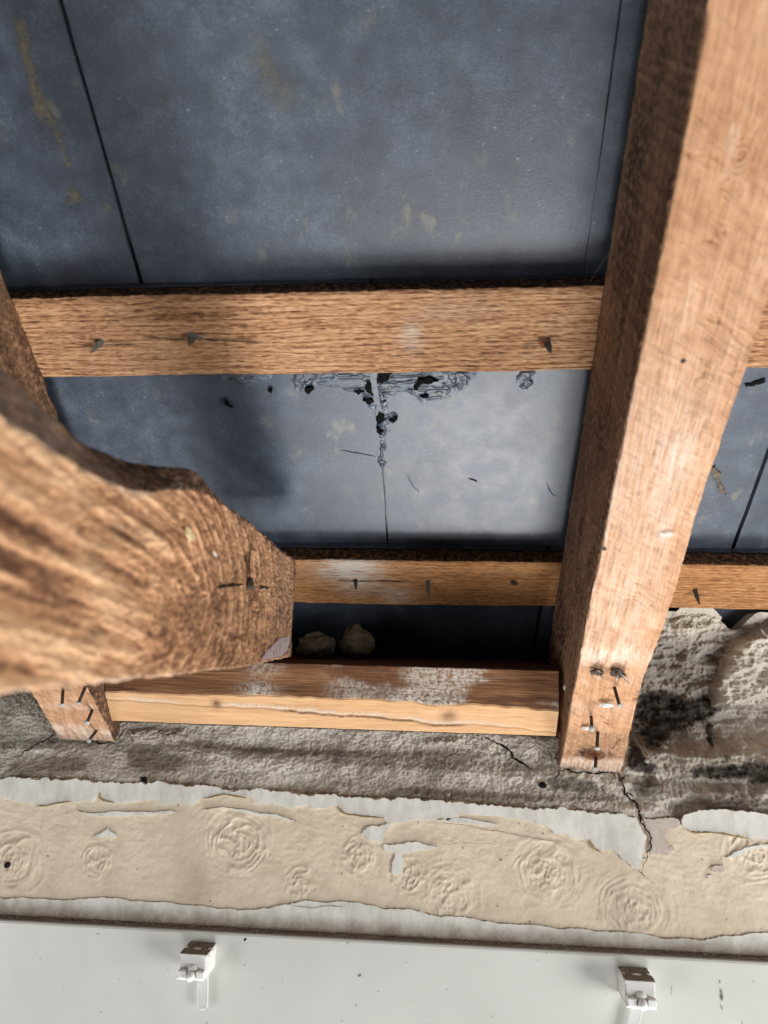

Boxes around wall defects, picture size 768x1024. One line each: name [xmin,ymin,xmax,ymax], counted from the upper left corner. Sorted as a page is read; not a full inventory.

spalling [217,374,273,394]
spalling [291,371,476,468]
spalling [516,370,536,389]
peeling [0,776,768,879]
crack [483,735,652,875]
leakage [627,690,718,796]
leakage [692,762,768,786]
peeling [0,897,768,957]